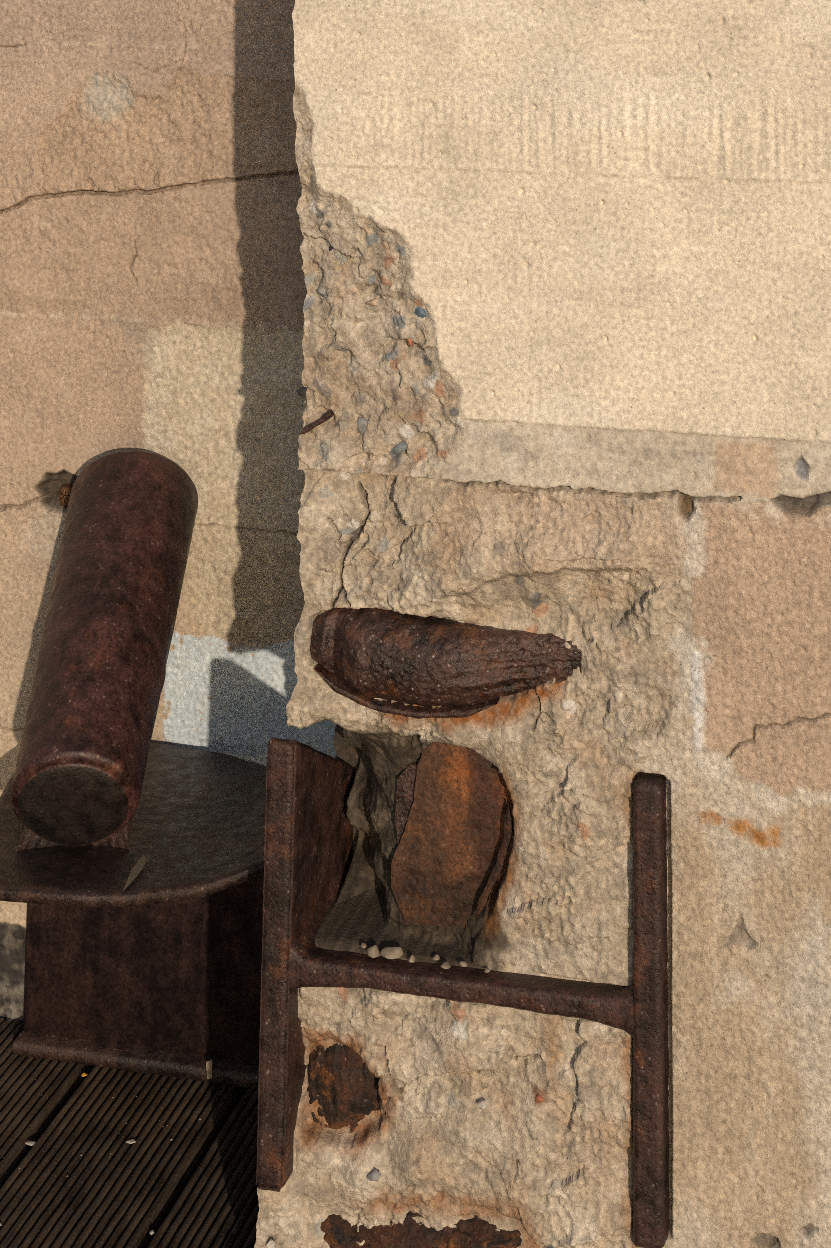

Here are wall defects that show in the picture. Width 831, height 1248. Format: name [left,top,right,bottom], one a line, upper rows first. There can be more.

crack [132,0,187,95]
crack [0,170,300,214]
crack [327,482,371,608]
flaking render [35,69,691,986]
hole [677,496,696,525]
rust [380,677,568,738]
crack [726,713,831,760]
rust [480,759,525,947]
rust [293,1024,404,1168]
spalling [254,987,630,1248]
rust [617,1032,641,1248]
rust [350,1186,546,1248]